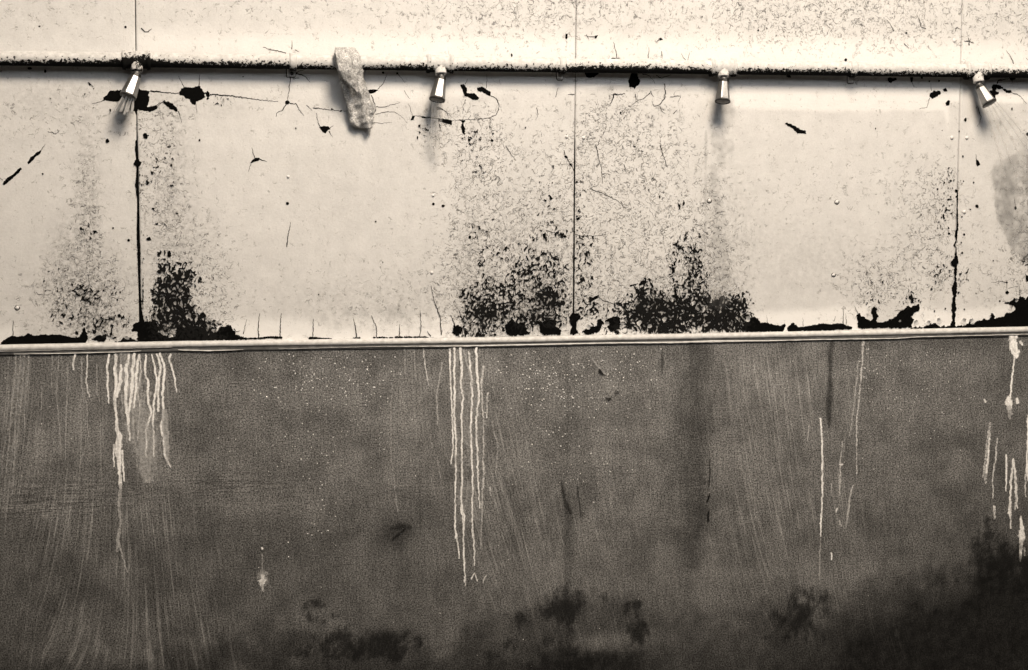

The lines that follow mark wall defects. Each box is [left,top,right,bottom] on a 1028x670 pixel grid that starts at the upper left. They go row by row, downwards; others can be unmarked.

water stain [139,136,178,237]
water stain [43,249,232,572]
water stain [423,180,755,586]